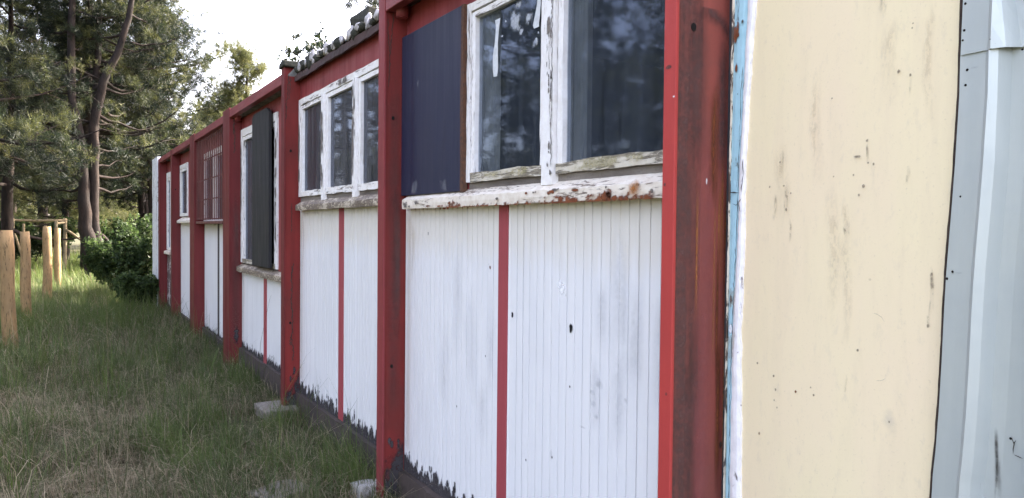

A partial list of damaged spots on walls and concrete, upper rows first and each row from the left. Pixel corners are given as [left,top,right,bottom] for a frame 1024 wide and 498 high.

corrosion [672,0,728,498]